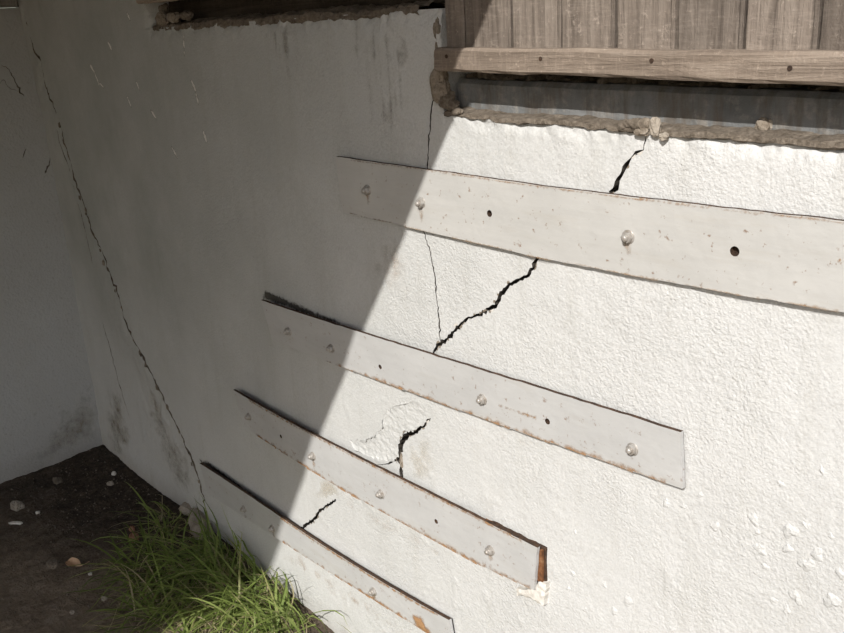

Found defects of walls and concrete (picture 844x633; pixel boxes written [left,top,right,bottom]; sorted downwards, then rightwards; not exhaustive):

crack [426,100,434,169]
crack [609,137,646,193]
crack [26,22,205,503]
crack [423,231,539,353]
peeling [350,401,426,462]
crack [378,418,431,477]
corrosion [484,419,596,458]
crack [301,499,336,529]
corrosion [337,486,481,566]
corrosion [335,575,429,633]
peeling [517,581,551,606]